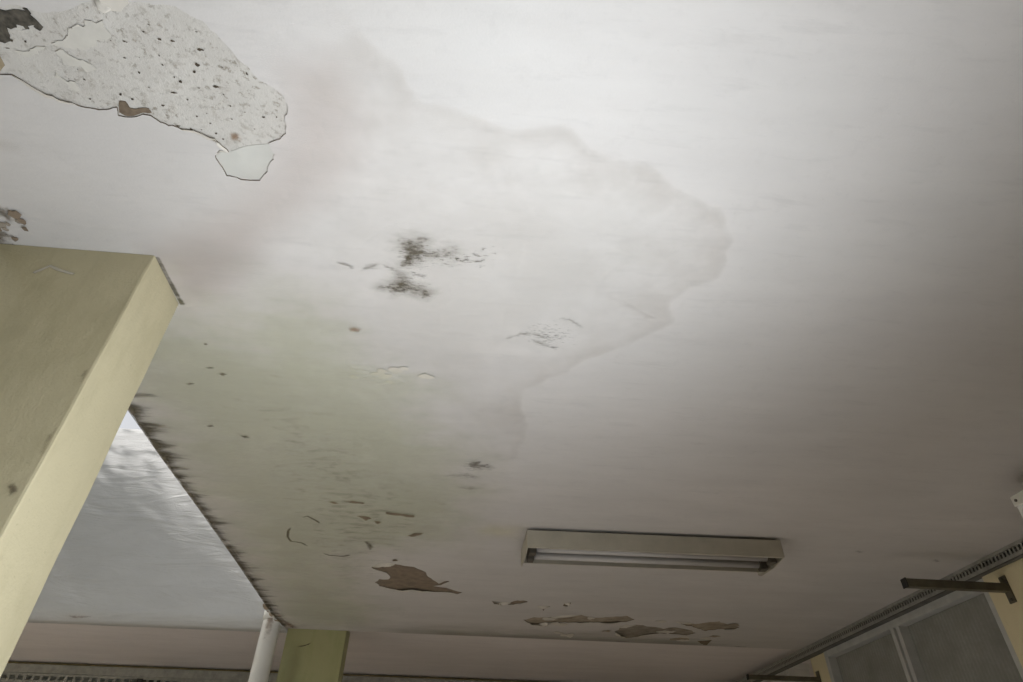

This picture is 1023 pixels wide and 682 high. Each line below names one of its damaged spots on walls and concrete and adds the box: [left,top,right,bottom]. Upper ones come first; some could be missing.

peeling [0,0,288,181]
peeling [0,211,28,242]
damp [128,395,285,626]
peeling [371,563,462,594]
peeling [525,602,739,645]